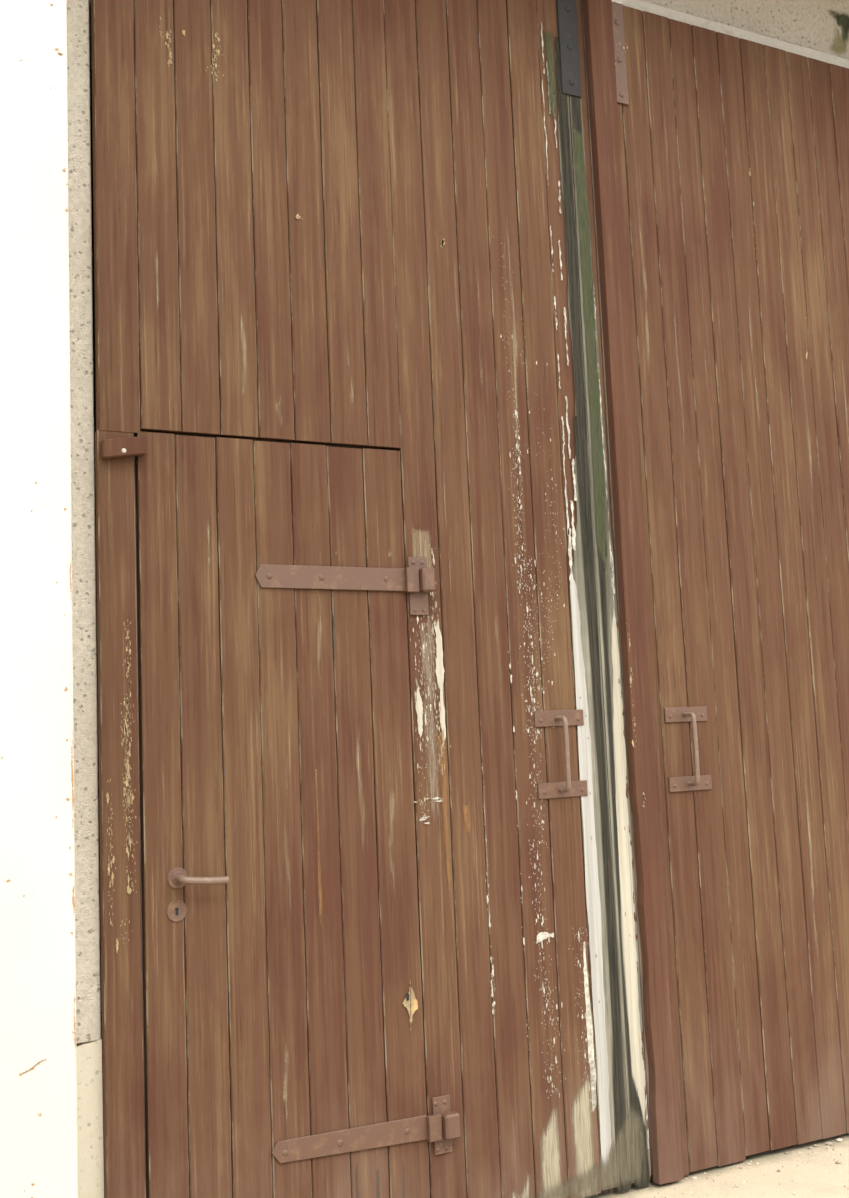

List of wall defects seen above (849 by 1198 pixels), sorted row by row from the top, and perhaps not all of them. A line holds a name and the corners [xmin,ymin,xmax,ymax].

peeling [541,22,562,214]
peeling [414,532,435,567]
peeling [106,619,137,952]
peeling [410,592,451,778]
peeling [507,296,649,1198]